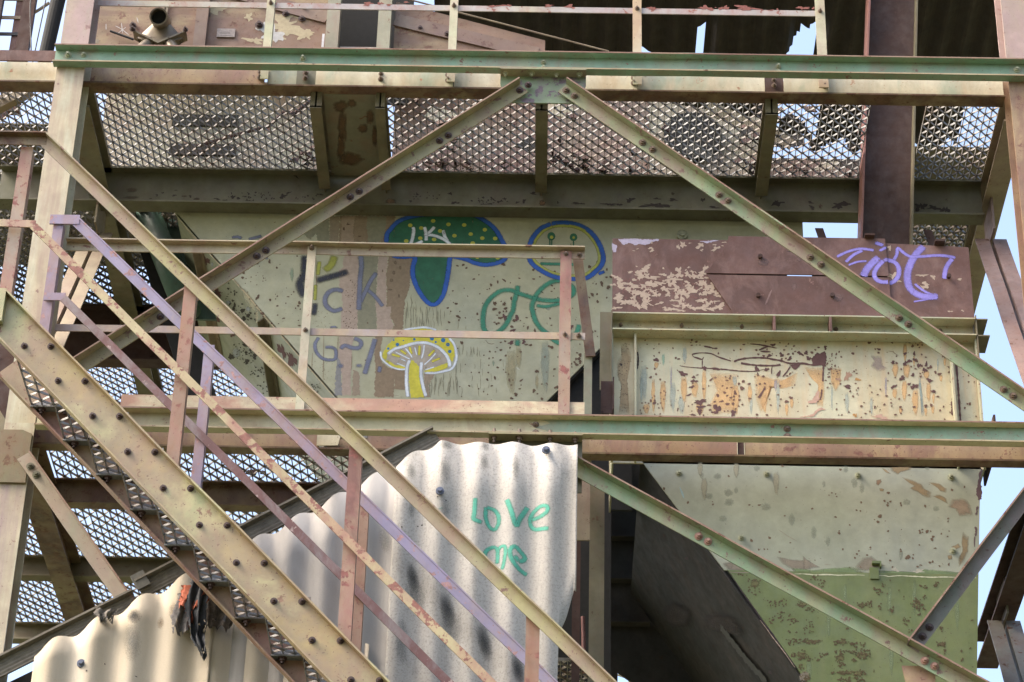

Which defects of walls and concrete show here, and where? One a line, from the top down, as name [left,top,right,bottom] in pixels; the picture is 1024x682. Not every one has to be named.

corrosion [334,100,377,165]
corrosion [214,259,301,326]
peeling [610,238,726,312]
corrosion [228,334,264,394]
corrosion [277,344,297,367]
peeling [974,468,982,547]
corrosion [725,562,875,682]